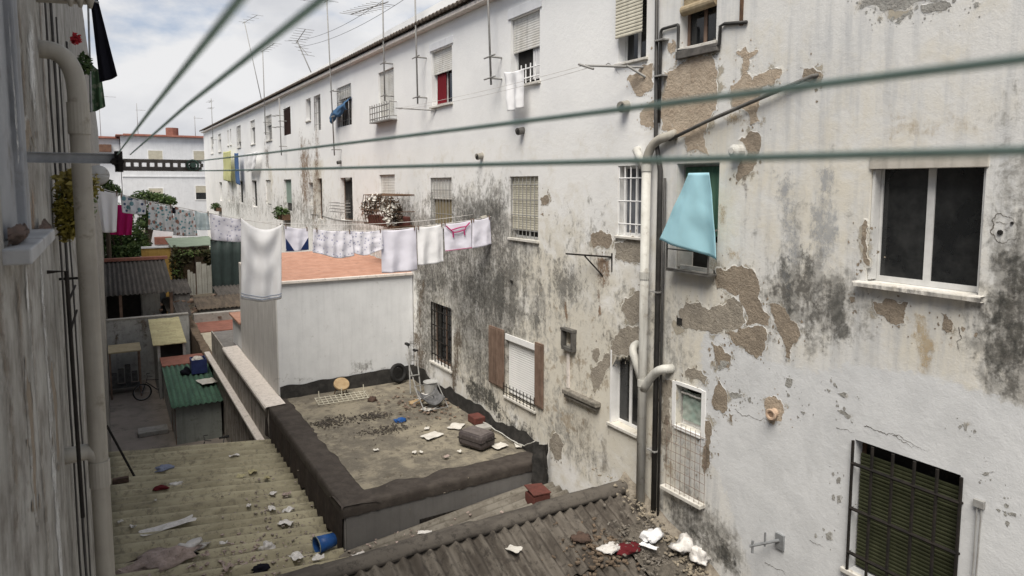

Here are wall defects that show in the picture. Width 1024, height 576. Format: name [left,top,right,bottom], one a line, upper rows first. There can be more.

flaking render [847,0,981,30]
flaking render [627,39,785,184]
water stain [451,331,533,437]
water stain [456,245,586,329]
flaking render [585,284,640,396]
flaking render [658,255,814,479]
water stain [780,169,838,316]
water stain [812,284,850,338]
flaking render [821,377,859,423]
crack [836,425,925,451]
flaking render [868,293,911,337]
water stain [983,251,1024,373]